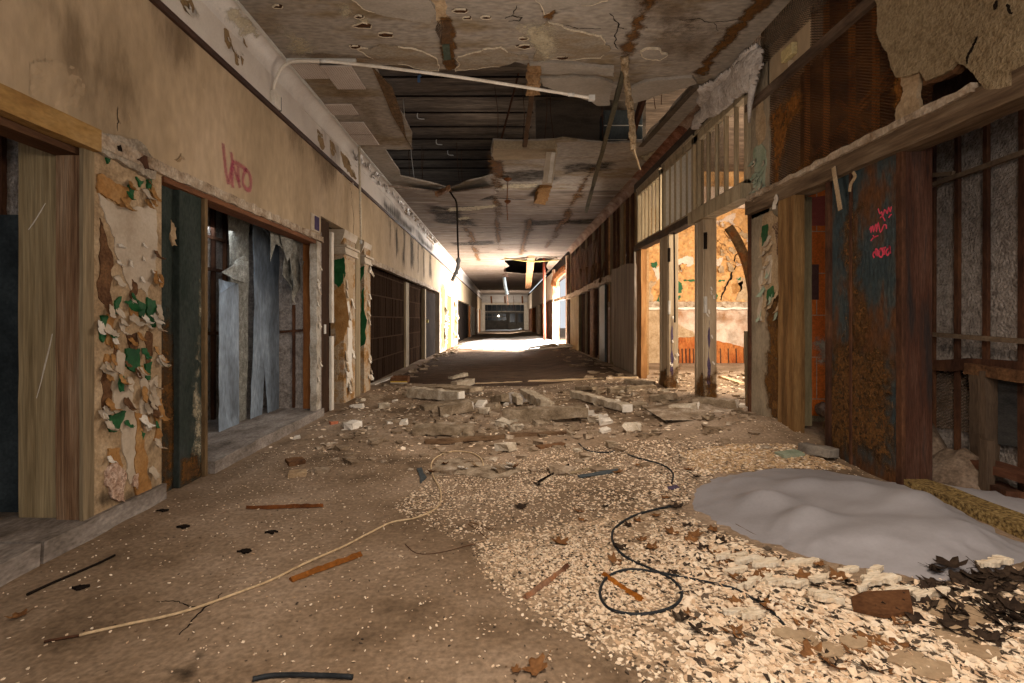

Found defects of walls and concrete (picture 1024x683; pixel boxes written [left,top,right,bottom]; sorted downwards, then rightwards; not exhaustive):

peeling [224,9,258,66]
rust [440,17,457,70]
rust [619,0,656,56]
spalling [800,0,895,166]
spalling [921,68,978,105]
spalling [492,140,557,183]
peeling [717,211,779,322]
peeling [95,132,177,502]
peeling [26,256,1024,683]